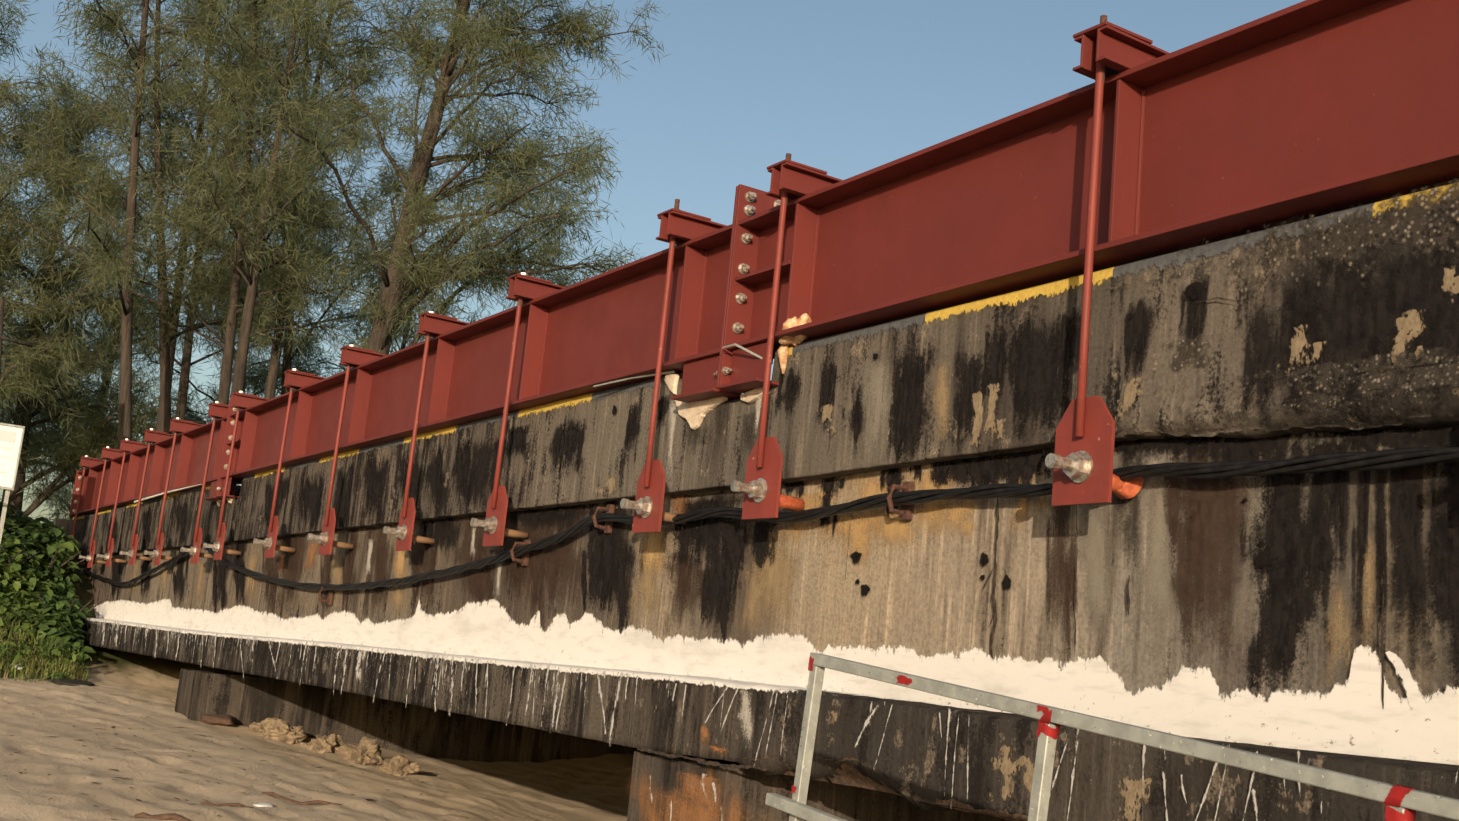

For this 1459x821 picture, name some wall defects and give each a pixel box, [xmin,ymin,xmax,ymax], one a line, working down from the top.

spalling [1168,178,1459,303]
leakage [624,396,701,473]
peeling [664,374,763,430]
leakage [818,311,1081,515]
peeling [969,383,1006,448]
leakage [1046,232,1459,694]
spalling [1163,309,1459,431]
leakage [106,419,795,641]
leakage [783,477,845,535]
rust [701,726,726,753]
rust [632,773,744,821]
spalling [741,745,1034,821]